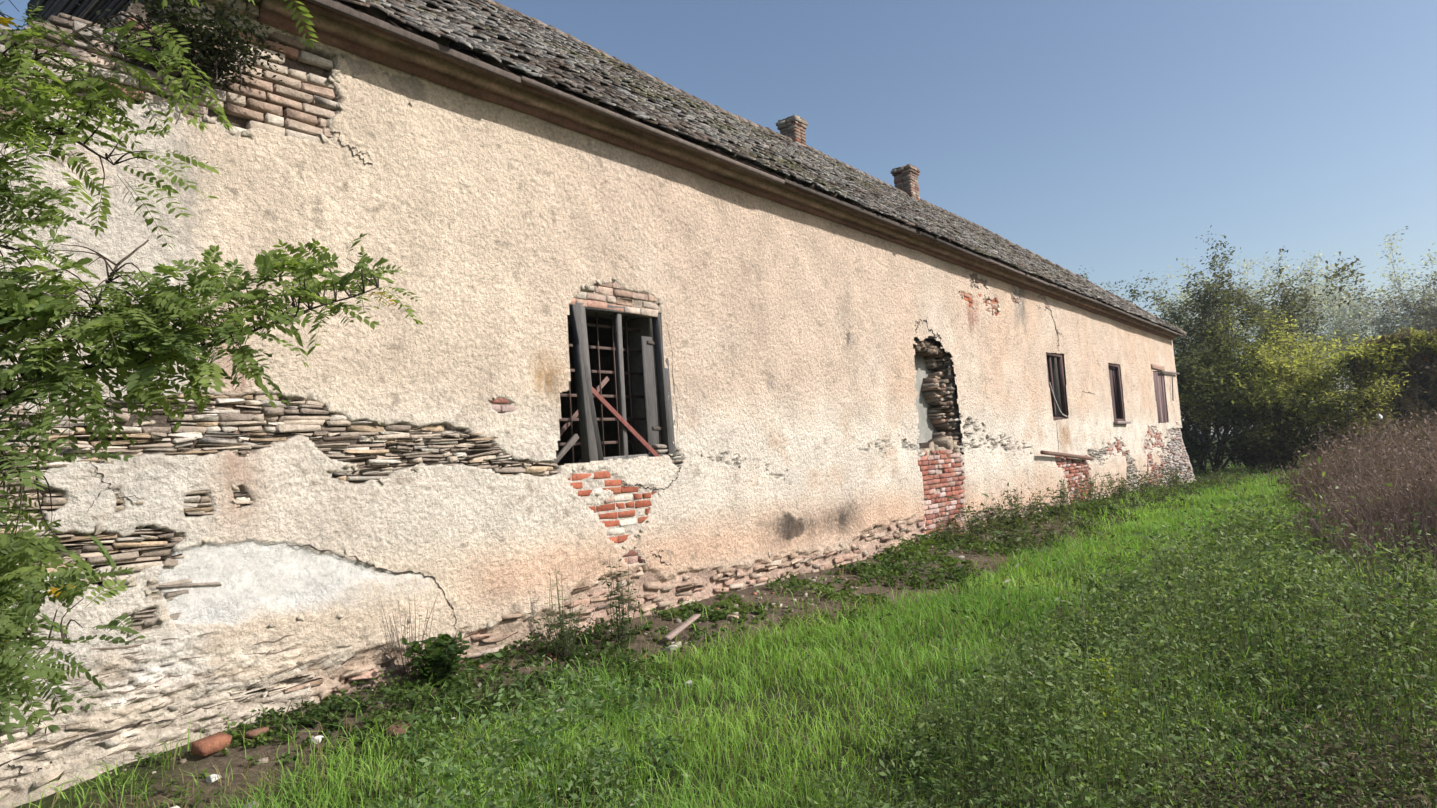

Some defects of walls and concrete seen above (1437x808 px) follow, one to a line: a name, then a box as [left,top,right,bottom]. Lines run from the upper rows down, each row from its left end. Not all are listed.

spalling [3,16,426,143]
spalling [569,277,662,318]
spalling [1055,424,1195,502]
spalling [0,391,1044,789]